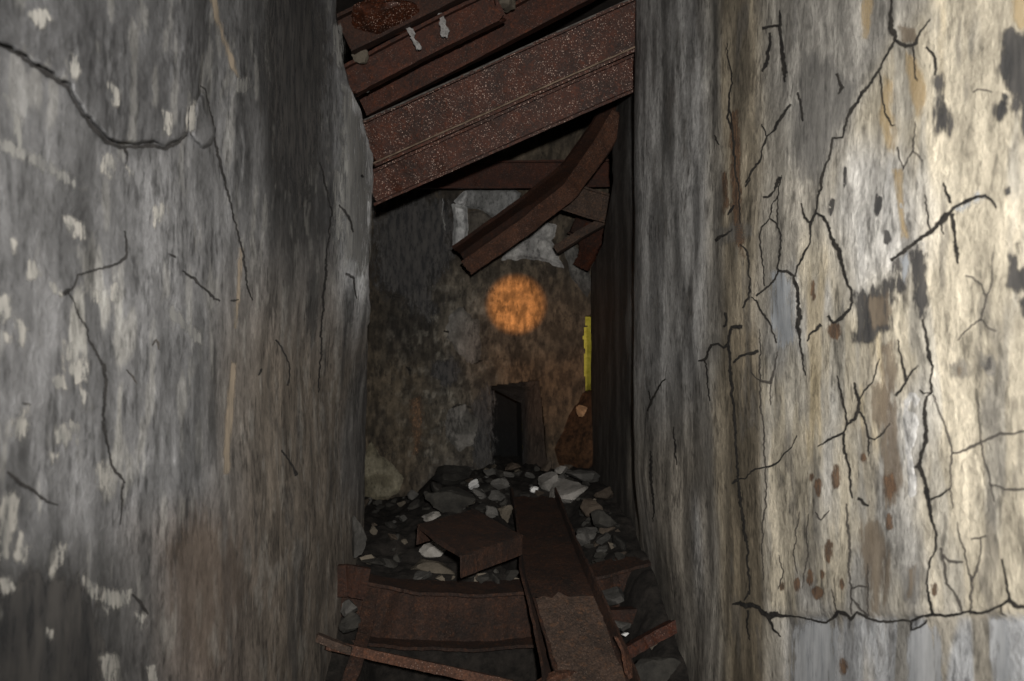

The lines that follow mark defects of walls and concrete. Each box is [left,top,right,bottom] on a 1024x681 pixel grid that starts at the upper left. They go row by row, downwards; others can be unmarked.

crack [0,44,187,166]
crack [169,85,253,302]
crack [59,230,137,525]
corrosion [780,539,833,599]
corrosion [809,464,841,497]
crack [698,0,1024,640]